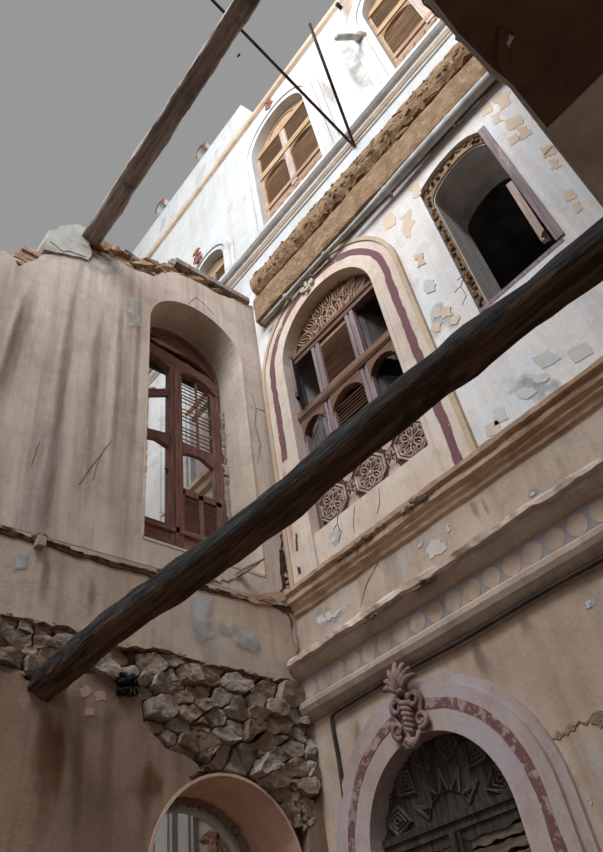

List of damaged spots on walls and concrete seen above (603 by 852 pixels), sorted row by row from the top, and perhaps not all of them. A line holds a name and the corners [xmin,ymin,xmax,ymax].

peeling [480,90,533,146]
damp [90,258,119,272]
peeling [515,342,594,399]
peeling [484,407,509,437]
peeling [316,606,349,627]